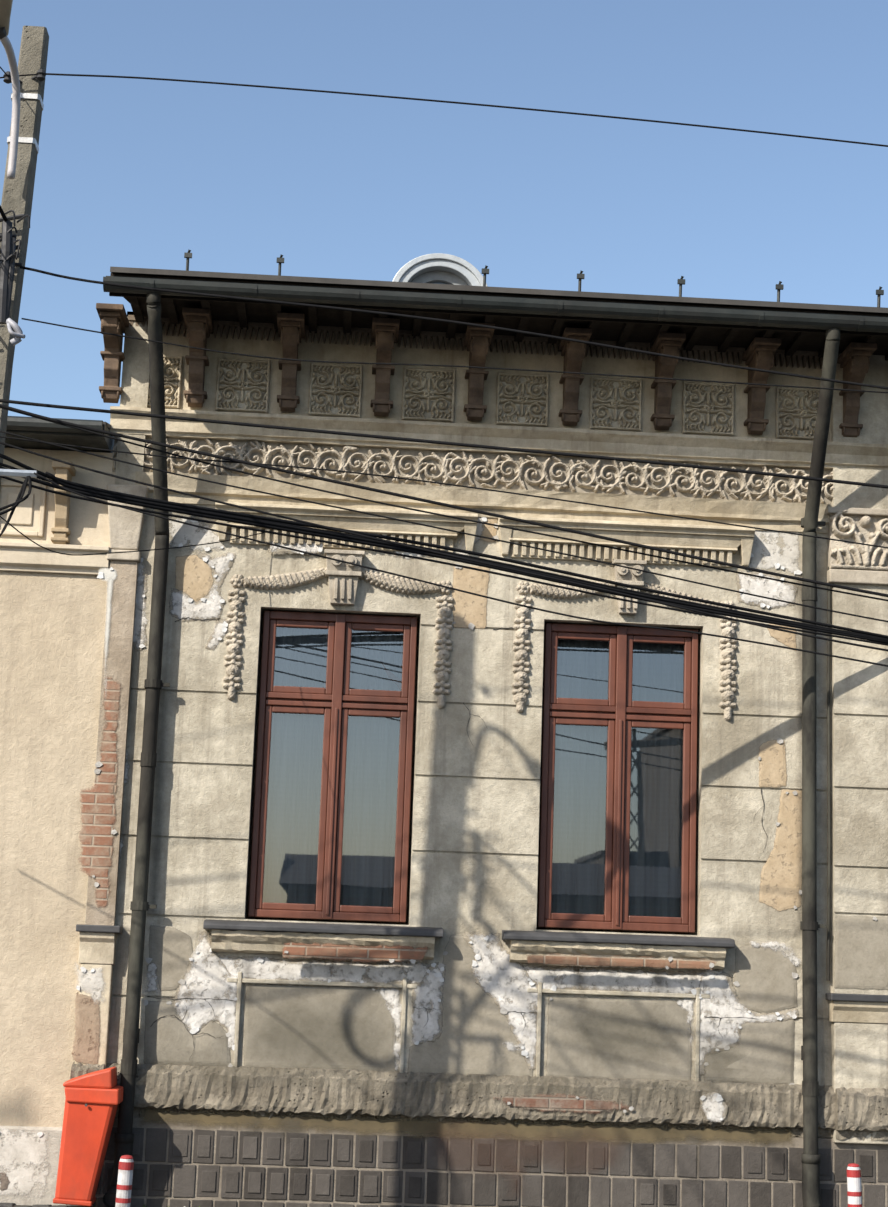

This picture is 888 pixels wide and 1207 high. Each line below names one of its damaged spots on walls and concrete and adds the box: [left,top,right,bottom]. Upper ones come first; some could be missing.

peeling [133,557,148,651]
peeling [169,519,236,650]
peeling [736,530,802,651]
flaking render [79,677,130,907]
peeling [174,929,446,1070]
peeling [463,932,799,1075]
peeling [0,1128,49,1196]